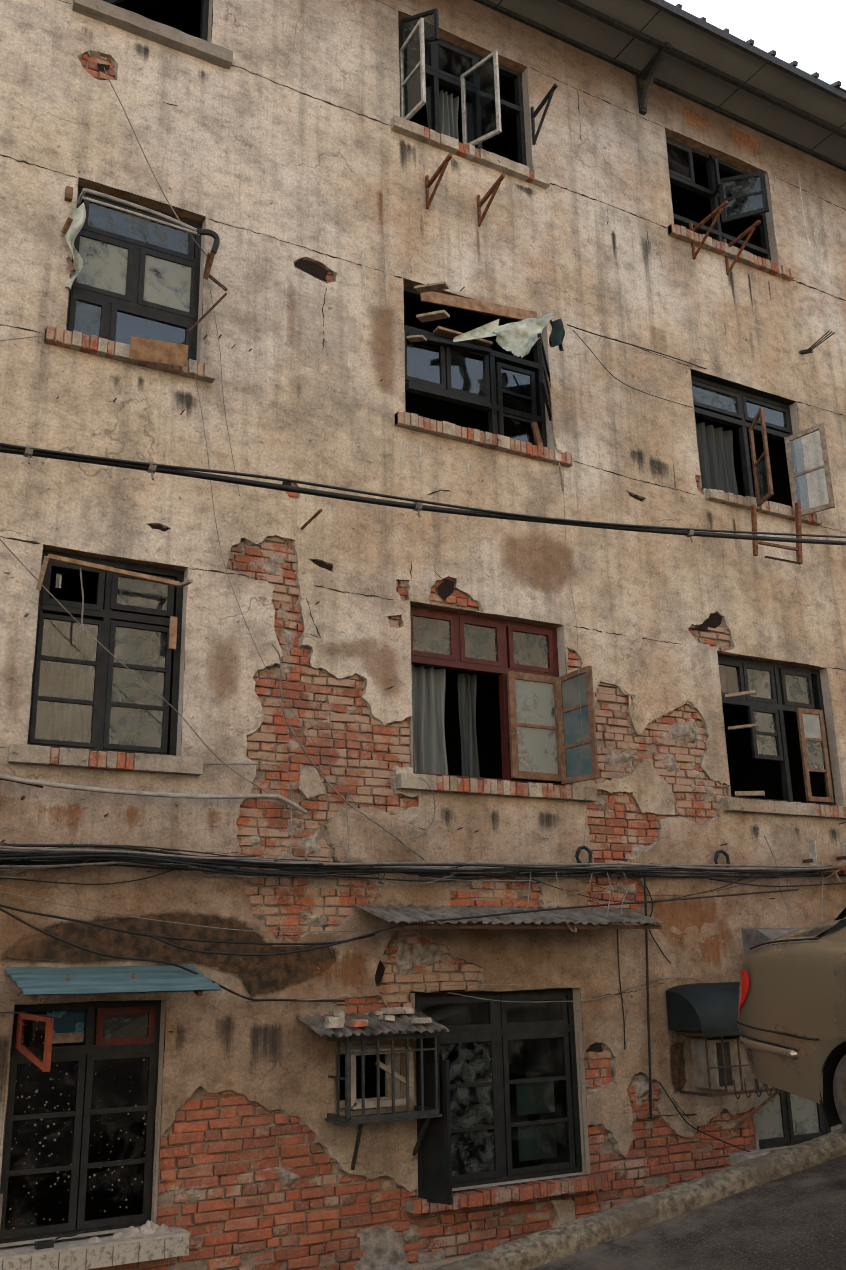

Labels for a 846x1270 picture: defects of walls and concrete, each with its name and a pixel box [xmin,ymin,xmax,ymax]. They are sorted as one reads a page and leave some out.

crack [0,154,77,178]
flaking render [388,576,485,628]
flaking render [688,611,738,657]
flaking render [226,535,419,942]
flaking render [586,681,730,912]
flaking render [418,848,548,909]
flaking render [300,929,485,1016]
flaking render [85,1033,756,1270]